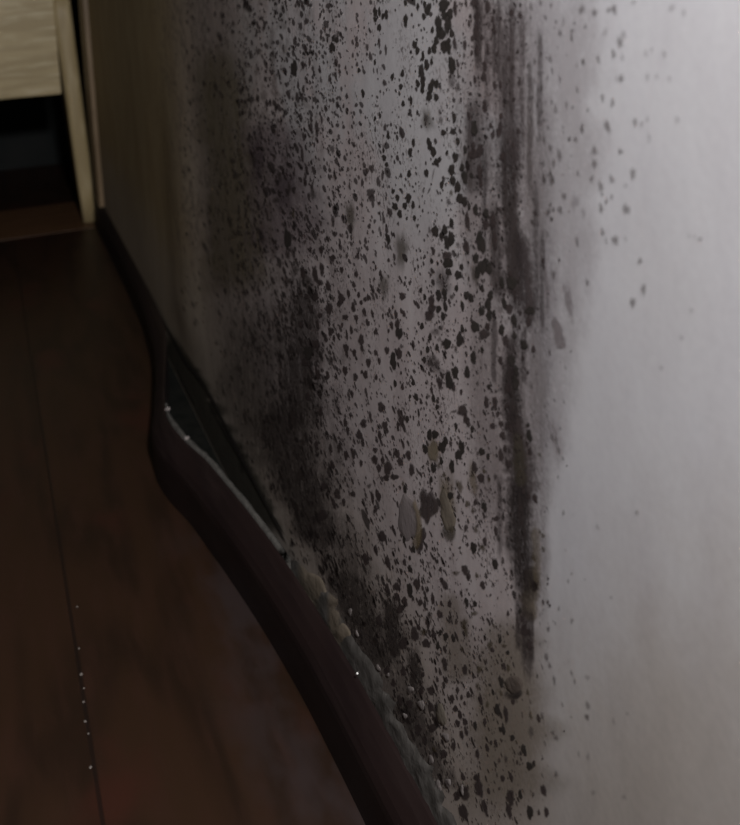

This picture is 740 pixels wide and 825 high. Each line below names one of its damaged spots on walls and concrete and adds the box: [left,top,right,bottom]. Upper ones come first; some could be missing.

leakage [167,0,551,825]
peeling [417,489,439,554]